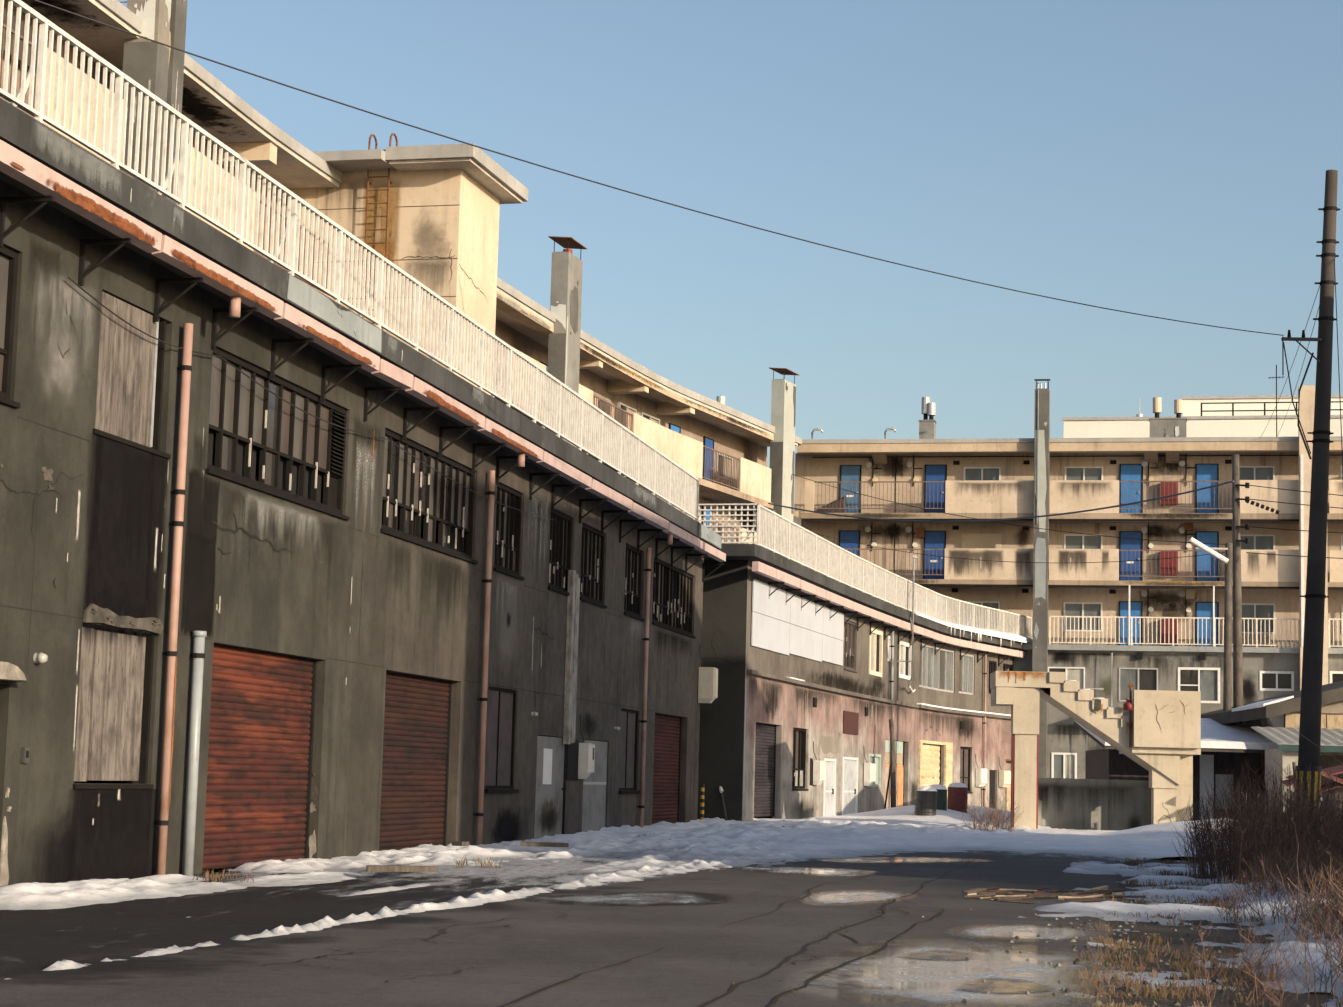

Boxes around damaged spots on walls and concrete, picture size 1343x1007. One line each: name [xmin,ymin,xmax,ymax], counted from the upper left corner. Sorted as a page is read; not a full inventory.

corrosion [48,179,158,246]
corrosion [365,187,399,288]
corrosion [173,249,275,311]
crack [402,250,487,327]
corrosion [299,324,375,367]
damp [1060,552,1086,568]
damp [751,680,777,715]
damp [797,675,851,717]
damp [859,679,897,717]